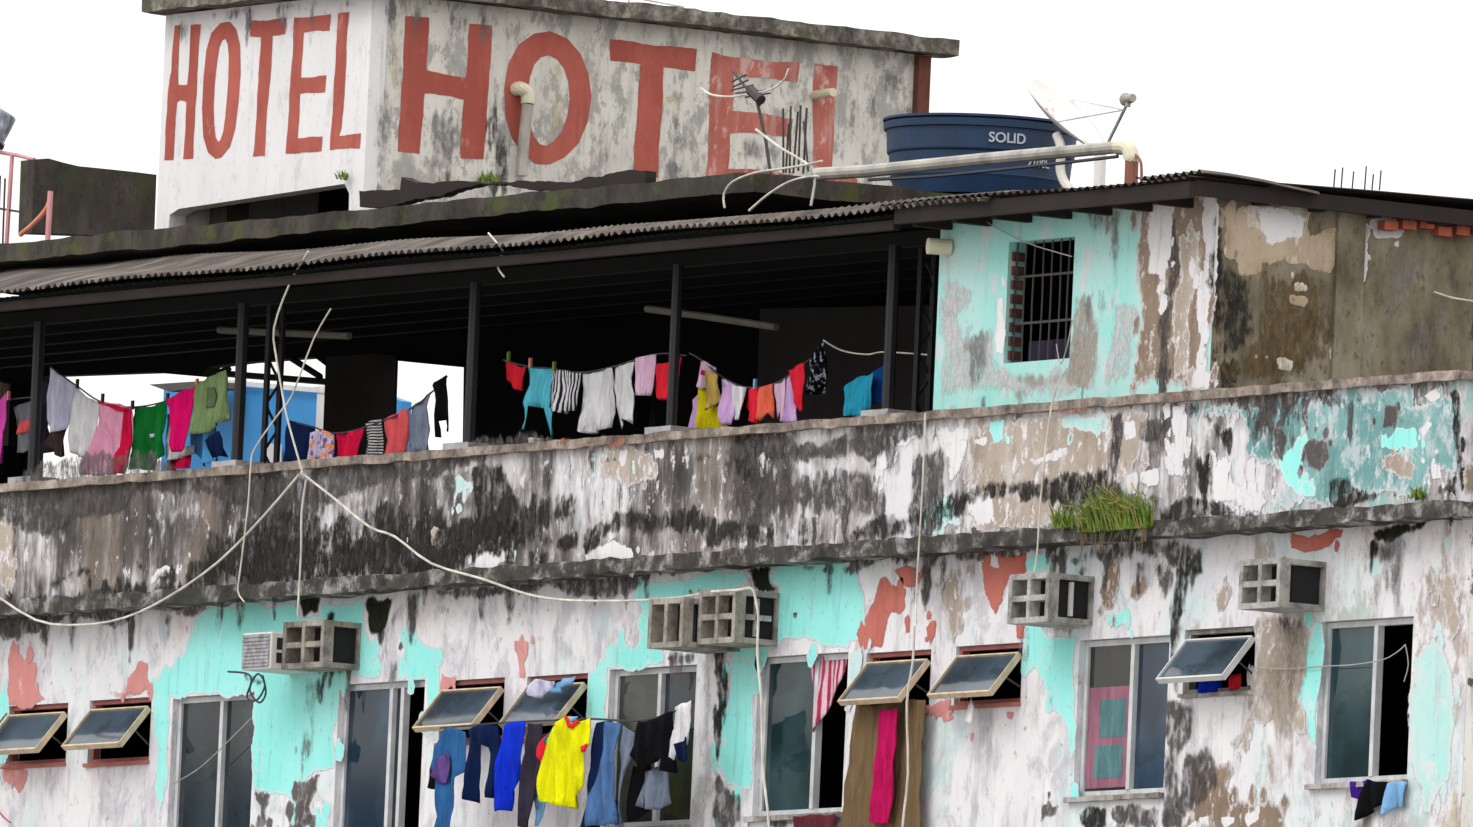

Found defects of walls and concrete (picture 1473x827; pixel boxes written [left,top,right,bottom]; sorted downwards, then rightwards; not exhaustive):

spalling [588,444,664,490]
leakage [0,210,1360,682]
peeling [872,196,1473,536]
mould [1329,478,1376,508]
leakage [1438,381,1466,533]
peeling [0,641,45,725]
peeling [121,598,456,827]
peeling [584,526,748,722]
peeling [708,548,1050,808]
peeling [1016,625,1079,821]
leakage [1080,684,1216,827]
peeling [1407,527,1473,816]